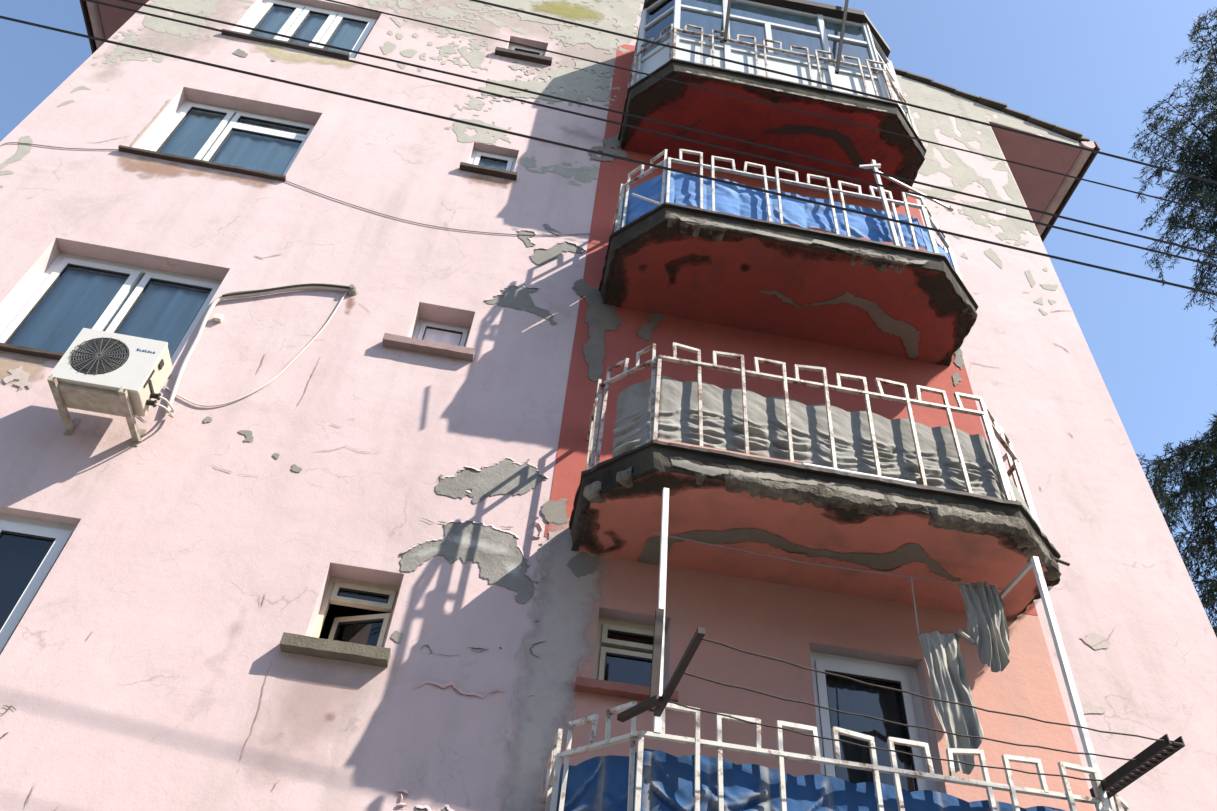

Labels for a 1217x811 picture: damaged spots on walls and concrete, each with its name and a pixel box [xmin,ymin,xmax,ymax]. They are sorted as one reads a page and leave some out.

peeling [92,0,221,66]
peeling [358,0,644,146]
spalling [686,71,886,112]
peeling [518,135,628,186]
spalling [766,125,865,167]
peeling [896,75,1080,269]
spalling [665,213,928,274]
peeling [485,285,557,325]
spalling [759,290,920,360]
spalling [435,457,549,504]
spalling [399,498,569,604]
spalling [583,459,1062,582]